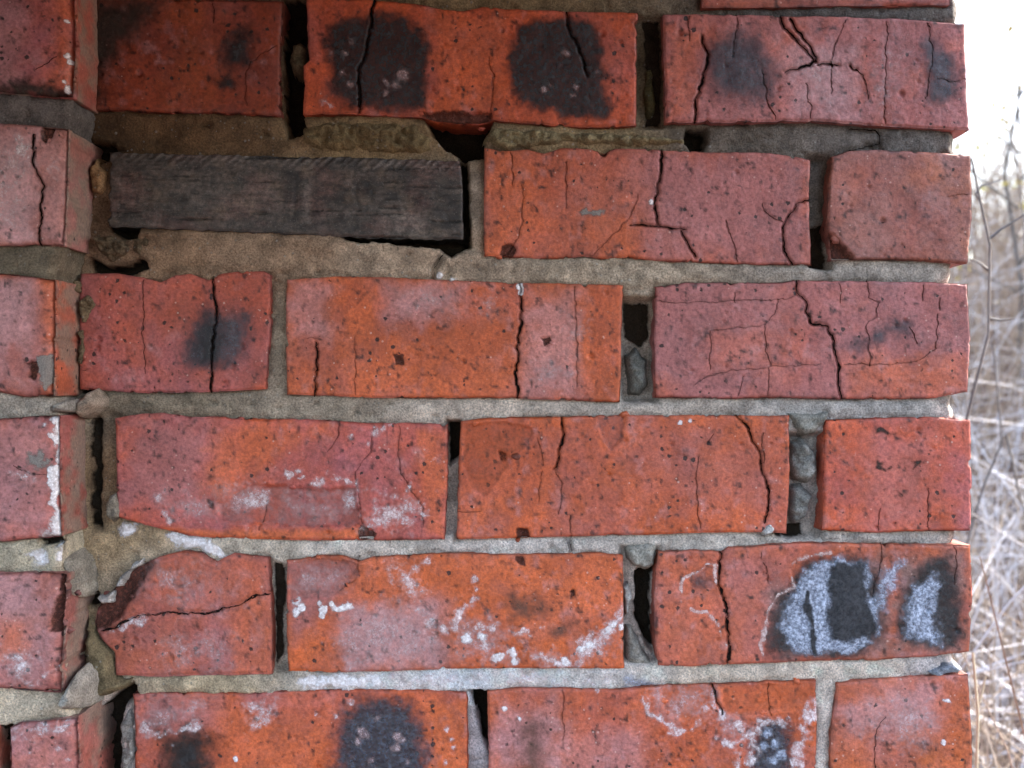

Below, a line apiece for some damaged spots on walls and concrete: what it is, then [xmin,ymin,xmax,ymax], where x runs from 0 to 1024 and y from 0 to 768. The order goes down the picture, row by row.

crack [762,16,889,151]
crack [32,134,45,246]
crack [599,149,696,257]
crack [514,283,523,398]
crack [659,200,941,523]
damp [23,416,63,564]
damp [293,597,305,617]
damp [318,601,353,619]
damp [298,673,392,690]
damp [428,577,534,684]
damp [577,612,623,655]
crack [712,552,731,715]